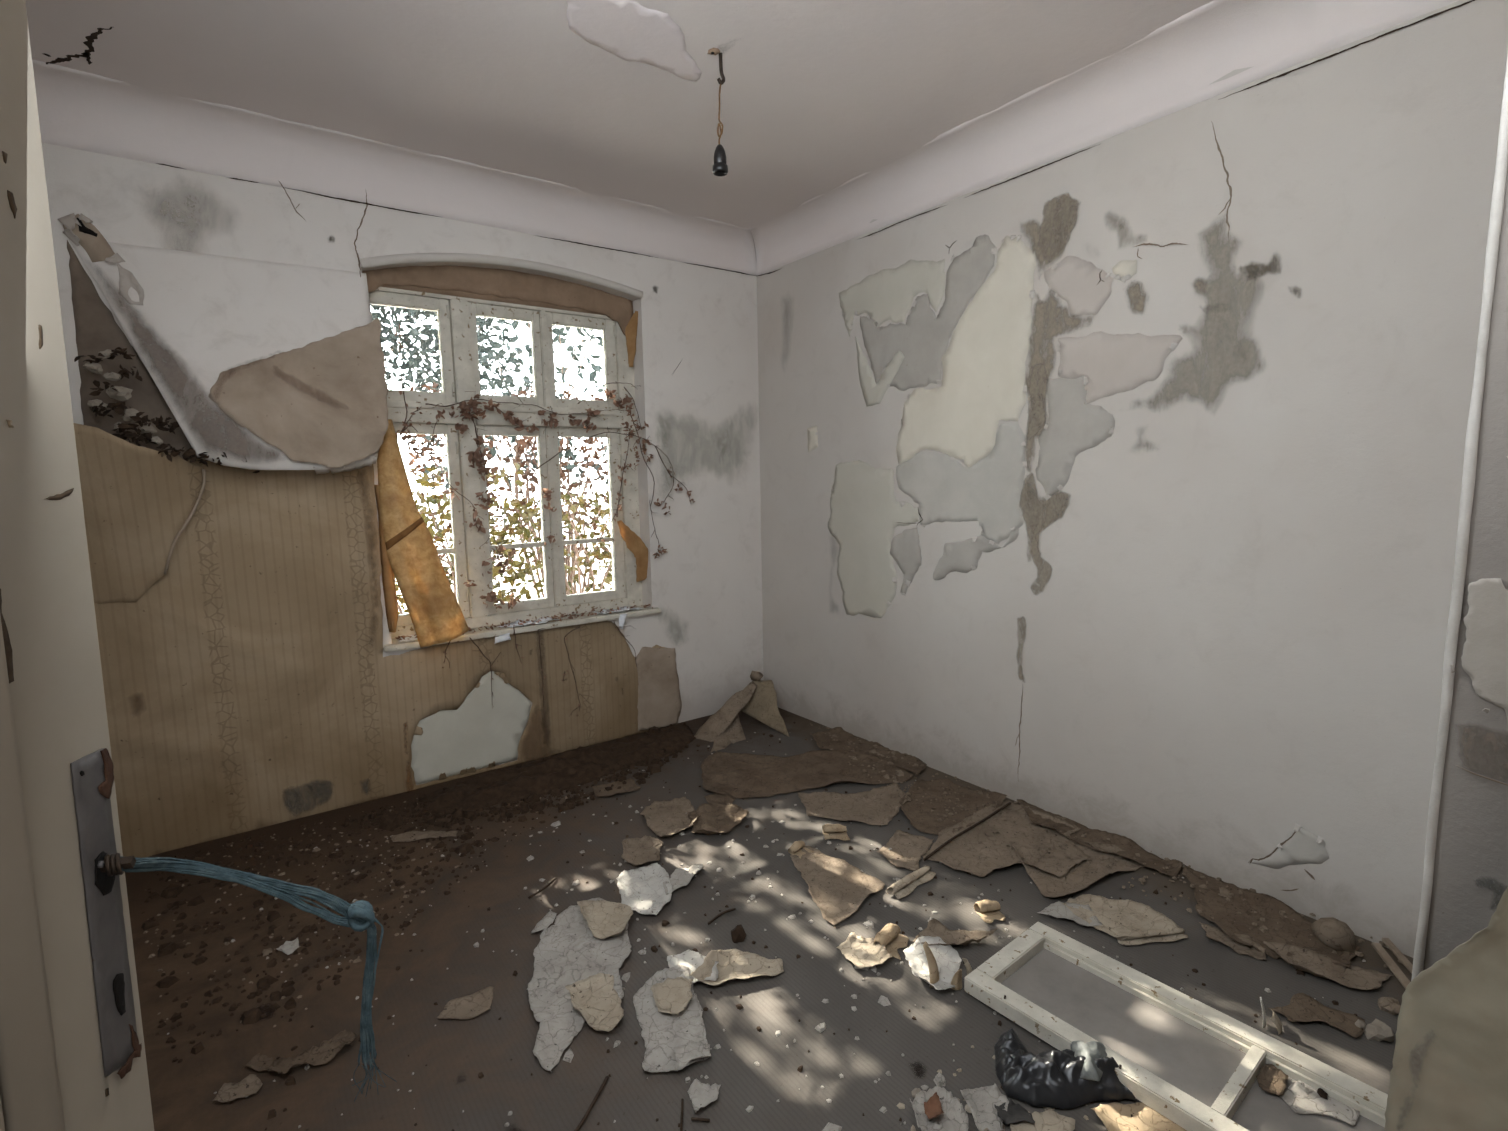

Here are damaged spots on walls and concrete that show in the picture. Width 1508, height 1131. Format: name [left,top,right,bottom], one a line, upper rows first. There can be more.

crack [43,27,112,65]
crack [1211,0,1475,241]
peeling [67,240,198,460]
peeling [827,234,1183,618]
peeling [1451,578,1508,721]
peeling [411,671,532,784]
crack [1015,691,1023,781]
peeling [1251,823,1329,869]